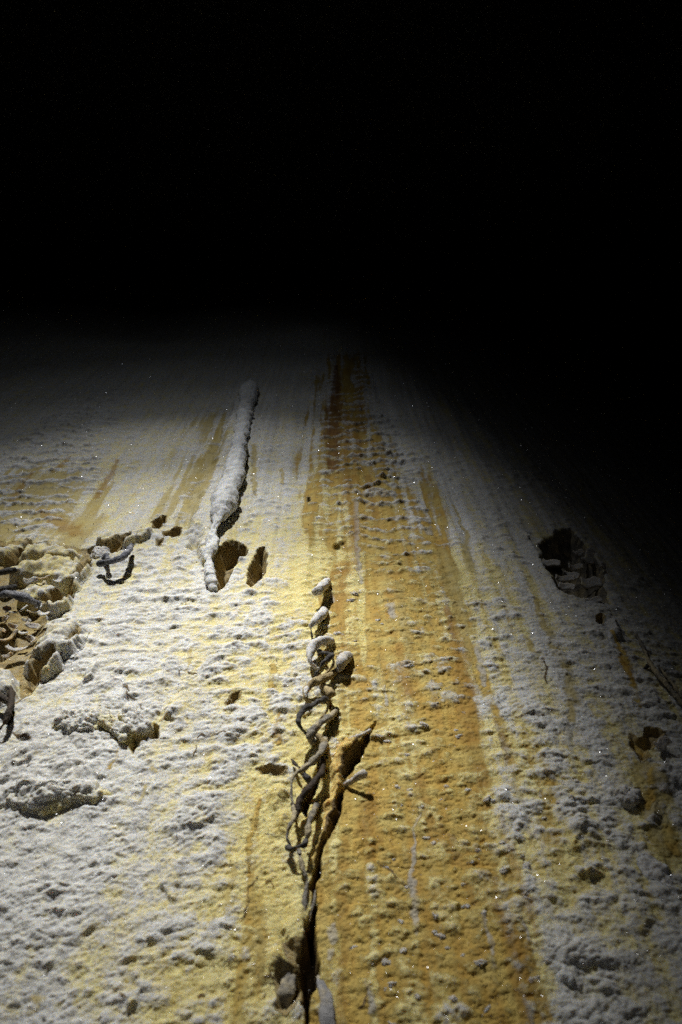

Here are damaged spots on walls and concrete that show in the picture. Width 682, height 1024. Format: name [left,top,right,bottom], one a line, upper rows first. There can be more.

spalling [0,531,132,707]
spalling [90,703,159,753]
spalling [150,515,182,546]
spalling [214,540,268,593]
rust [295,353,552,1024]
spalling [540,529,610,625]
rust [224,798,267,1024]
crack [299,730,373,1024]